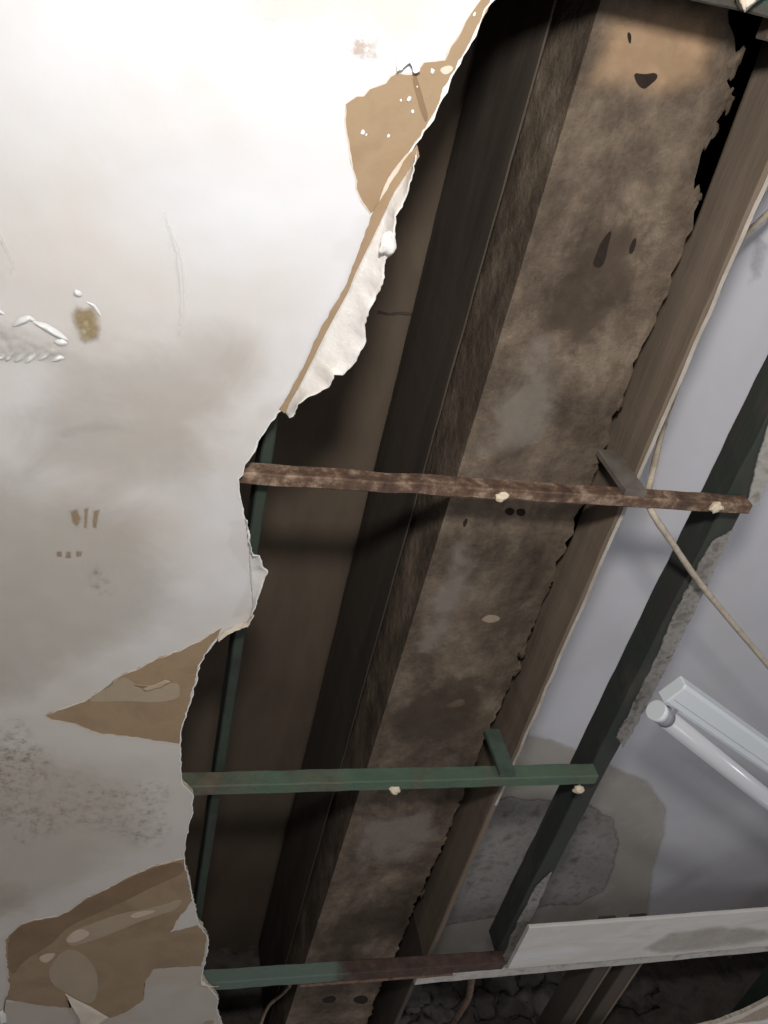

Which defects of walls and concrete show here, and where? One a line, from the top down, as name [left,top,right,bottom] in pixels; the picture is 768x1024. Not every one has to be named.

spalling [739,0,757,11]
spalling [634,73,657,89]
spalling [704,46,746,151]
spalling [688,185,702,213]
spalling [593,231,611,268]
peeling [279,145,419,418]
spalling [505,508,526,516]
spalling [482,615,500,623]
peeling [101,966,220,1024]
peeling [0,1002,80,1024]